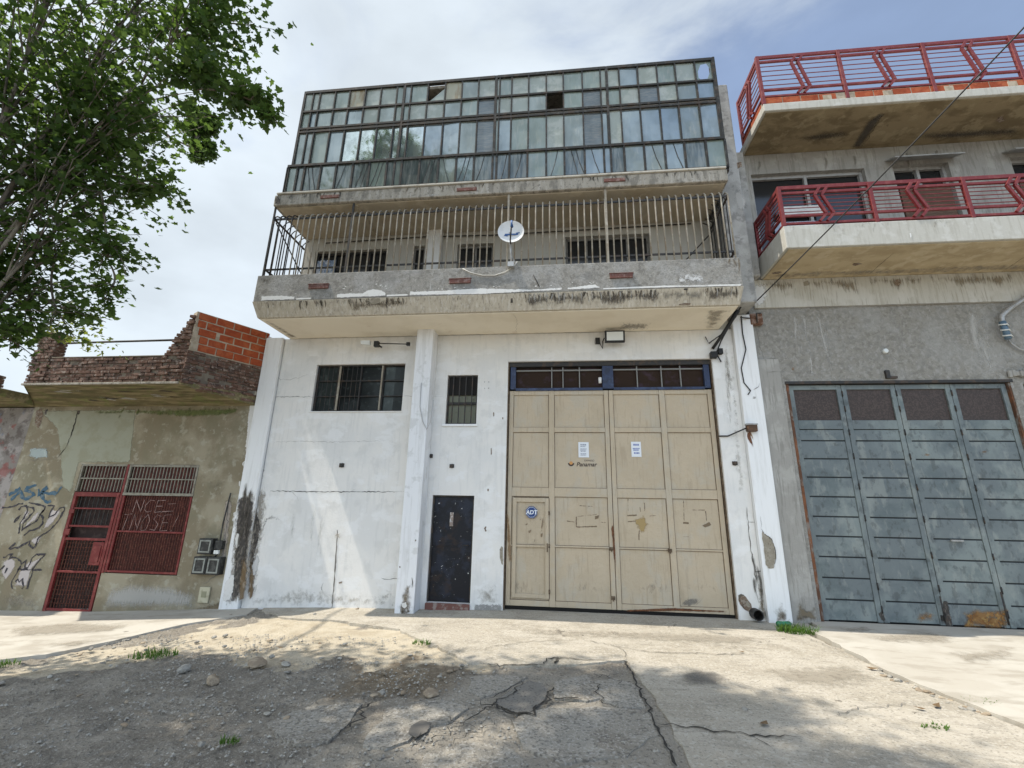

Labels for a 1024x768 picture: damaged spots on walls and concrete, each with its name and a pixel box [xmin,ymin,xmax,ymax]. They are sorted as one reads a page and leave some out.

leakage [944,266,1017,284]
leakage [348,298,404,310]
leakage [525,290,658,304]
leakage [677,288,737,298]
crack [23,411,80,462]
peeling [30,448,47,459]
peeling [627,503,656,537]
leakage [203,487,266,609]
spalling [760,517,776,569]
corrosion [965,610,1008,628]